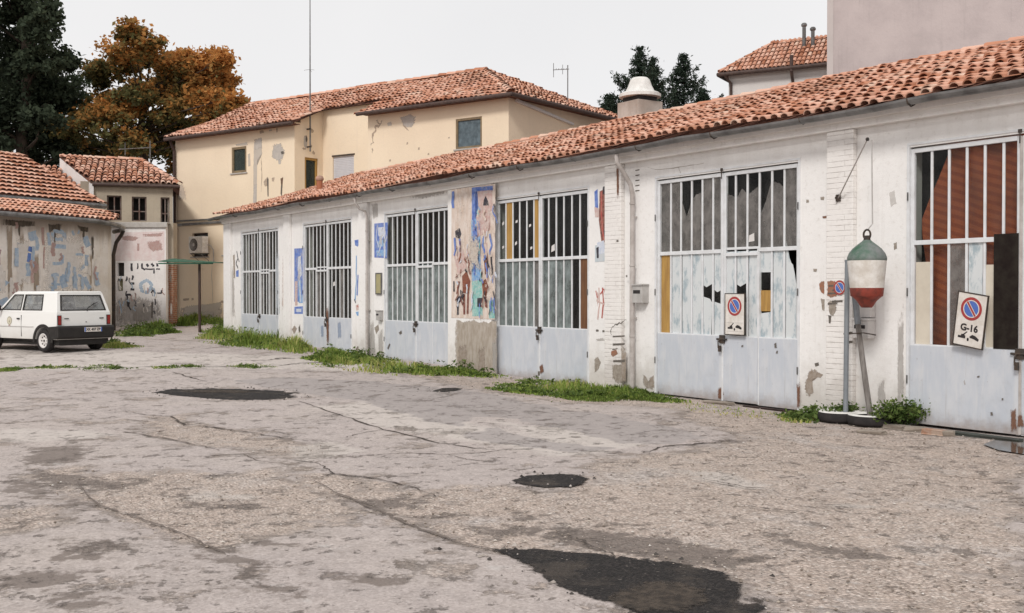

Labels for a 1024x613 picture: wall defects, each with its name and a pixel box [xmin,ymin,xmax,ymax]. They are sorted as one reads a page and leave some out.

peeling [236,128,285,166]
peeling [387,115,429,155]
spalling [813,269,837,323]
corrosion [1011,409,1024,431]